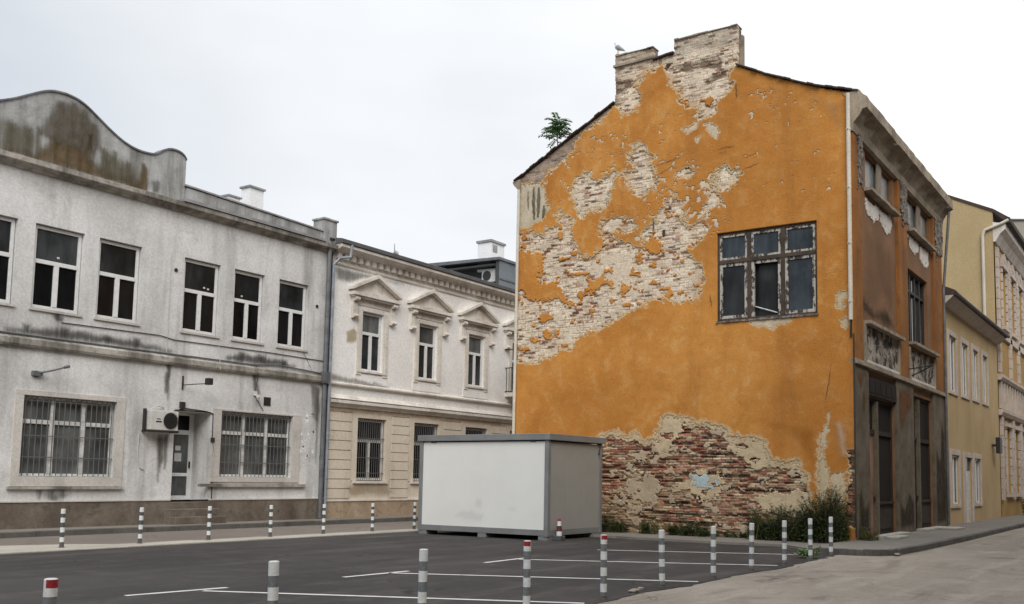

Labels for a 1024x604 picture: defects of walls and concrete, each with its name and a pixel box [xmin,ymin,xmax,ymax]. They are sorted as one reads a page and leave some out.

leakage [3,101,135,182]
flaking render [517,25,766,365]
flaking render [857,133,943,269]
flaking render [594,412,855,540]